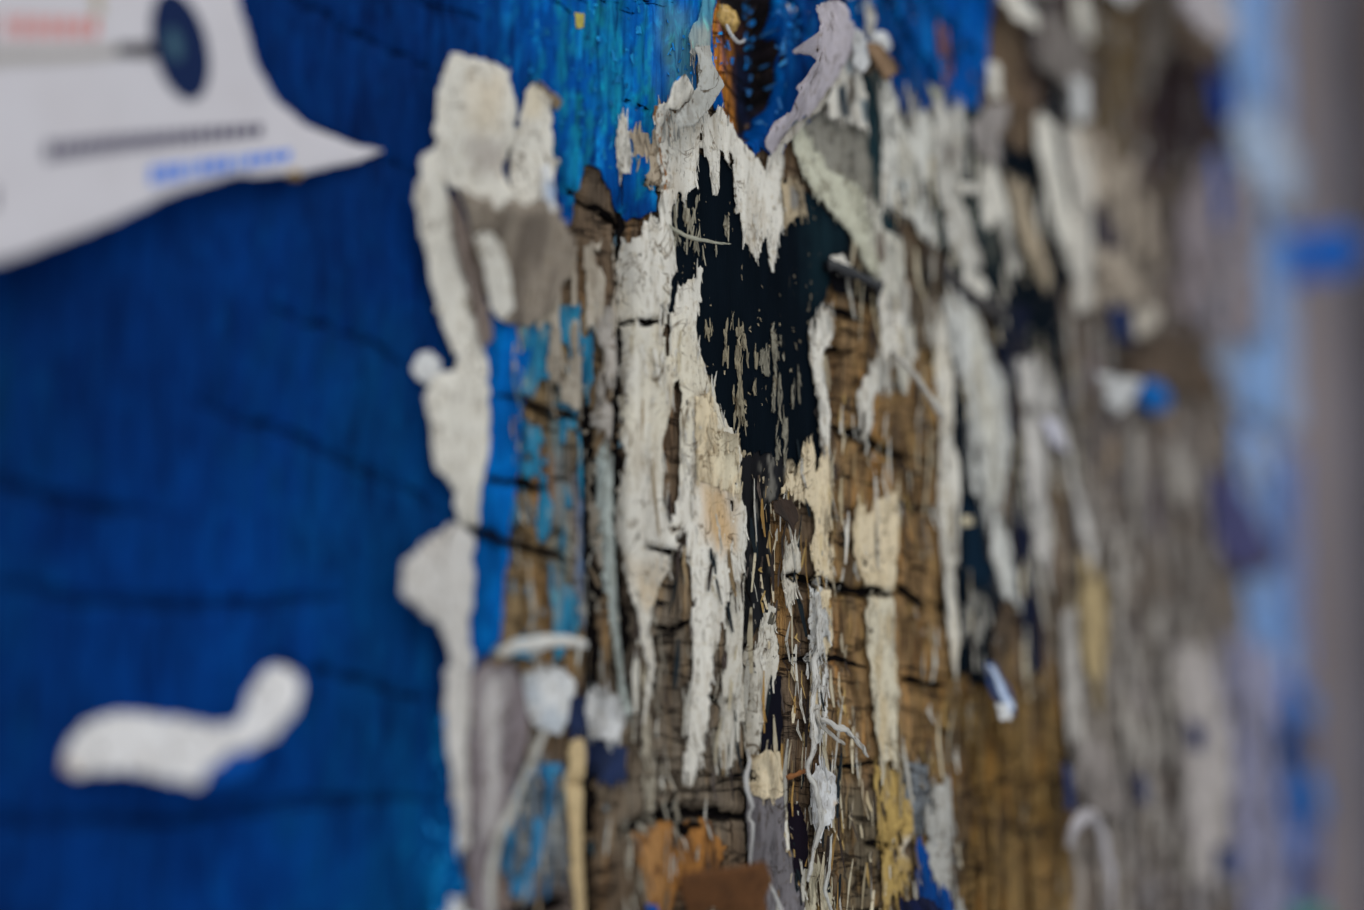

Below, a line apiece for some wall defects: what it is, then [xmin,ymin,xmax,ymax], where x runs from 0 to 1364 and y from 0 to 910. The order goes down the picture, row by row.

peeling [571,4,635,180]
peeling [668,0,801,126]
spalling [829,263,881,308]
peeling [900,231,943,351]
peeling [1110,304,1133,346]
peeling [493,237,619,667]
peeling [1211,467,1276,572]
peeling [501,762,567,902]
peeling [743,740,805,910]
peeling [810,754,839,843]
peeling [873,757,953,910]
peeling [1063,732,1125,824]